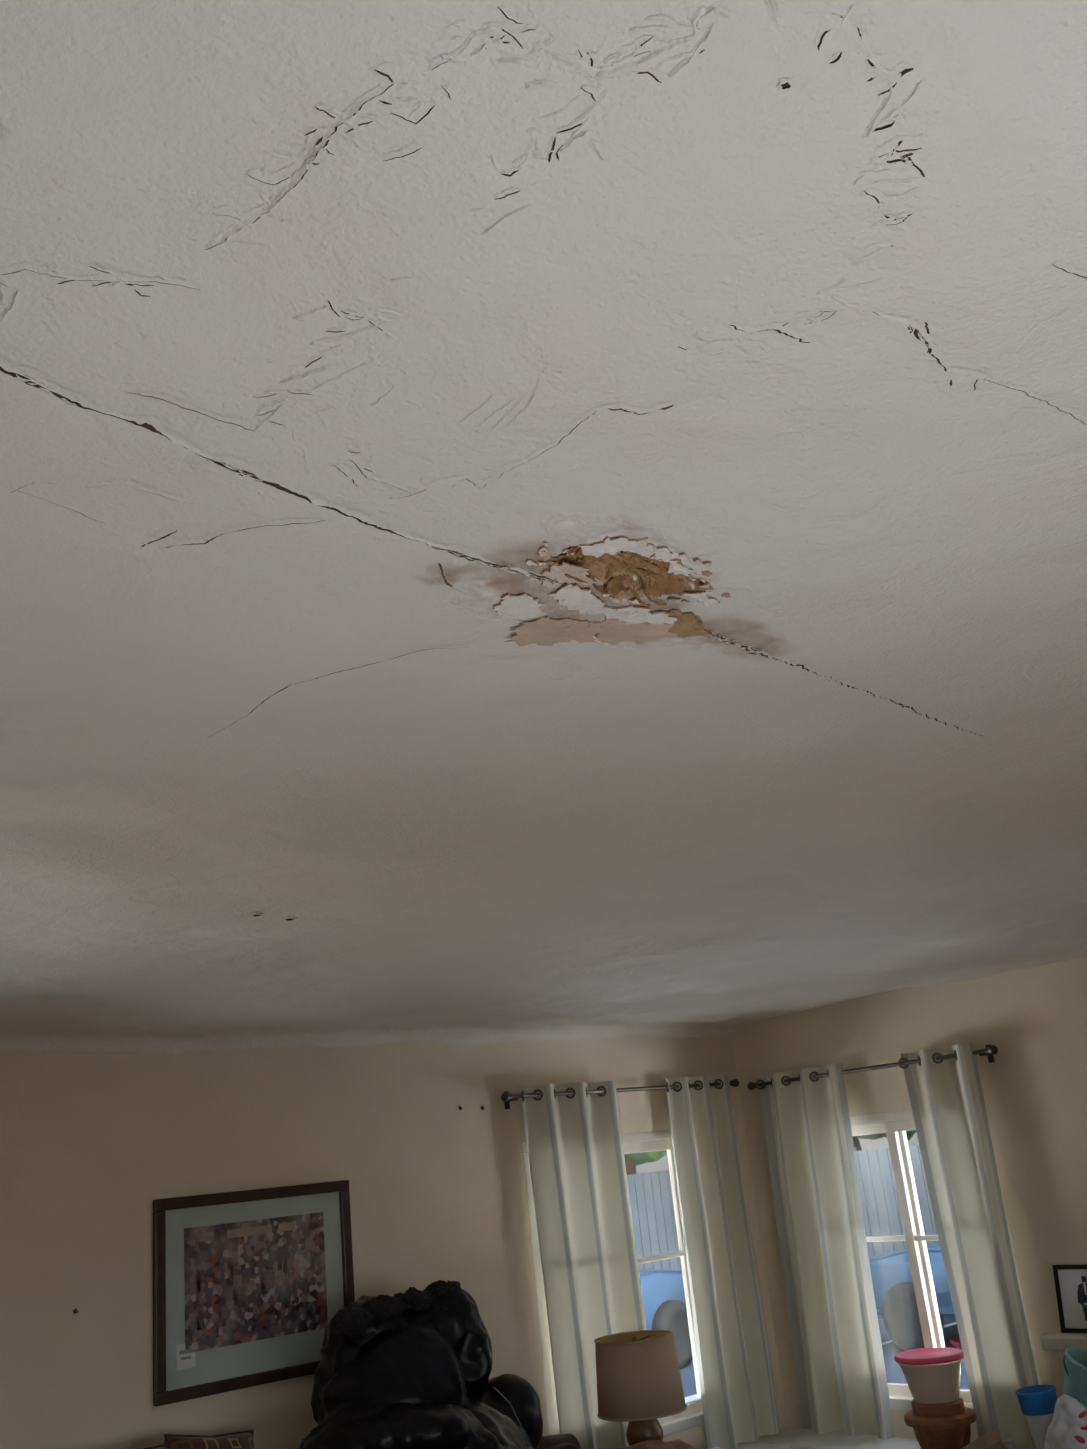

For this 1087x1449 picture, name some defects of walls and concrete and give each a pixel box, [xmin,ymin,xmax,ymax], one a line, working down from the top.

crack [677,309,837,357]
crack [872,310,1087,433]
crack [0,357,676,597]
flaking render [458,518,731,646]
crack [205,645,473,739]
crack [704,626,982,736]